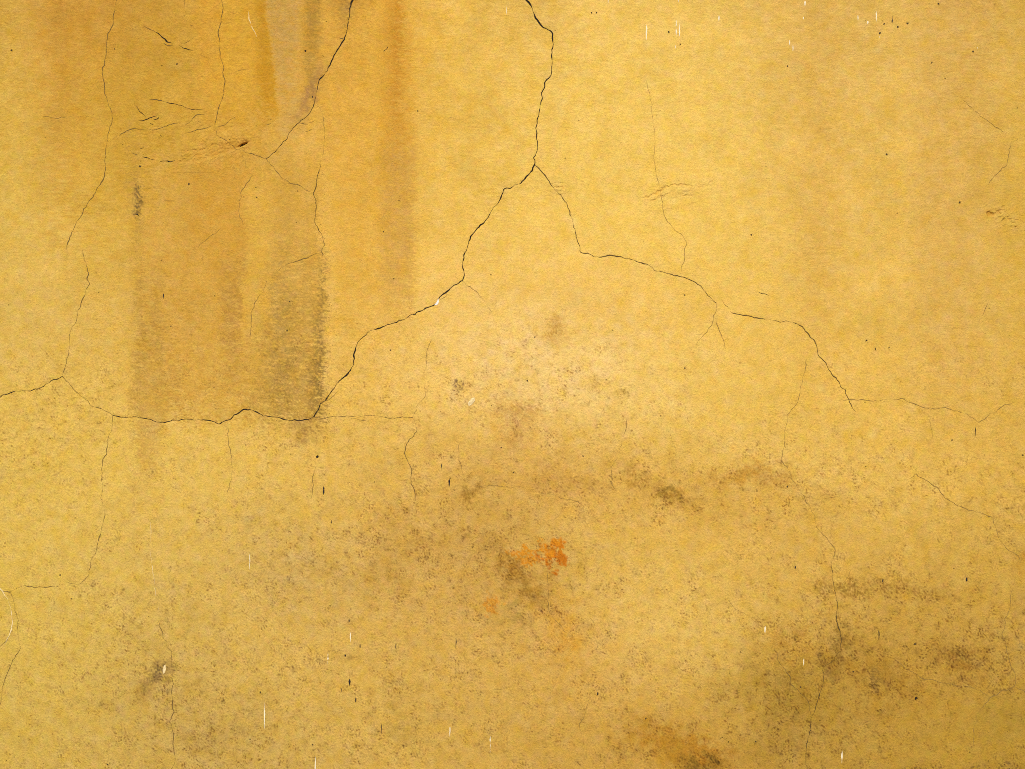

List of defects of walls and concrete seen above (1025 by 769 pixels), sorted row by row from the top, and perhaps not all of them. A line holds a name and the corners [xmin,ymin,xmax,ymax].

damp [109,0,340,565]
crack [0,0,949,629]
damp [610,454,723,524]
damp [354,653,456,769]
damp [469,516,554,644]
corrosion [498,532,599,703]
damp [697,602,1025,769]